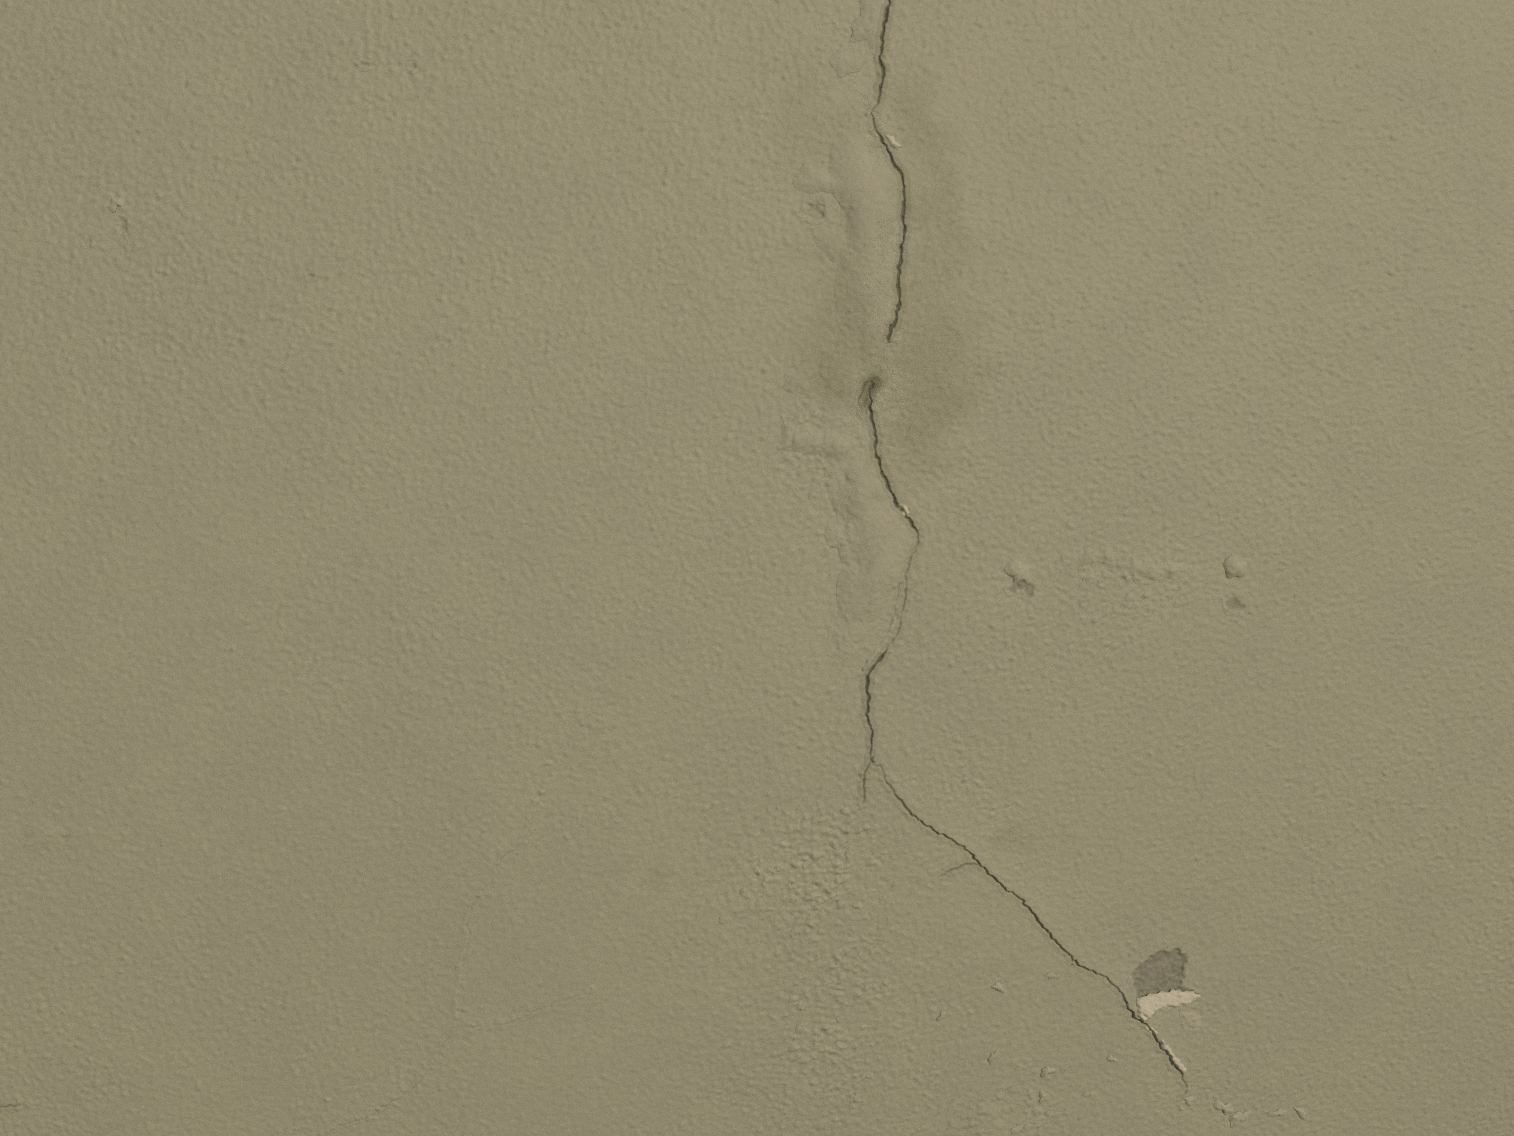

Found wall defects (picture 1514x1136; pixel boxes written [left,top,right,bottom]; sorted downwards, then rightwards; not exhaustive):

crack [852,0,1235,1136]
spalling [1127,944,1205,1033]